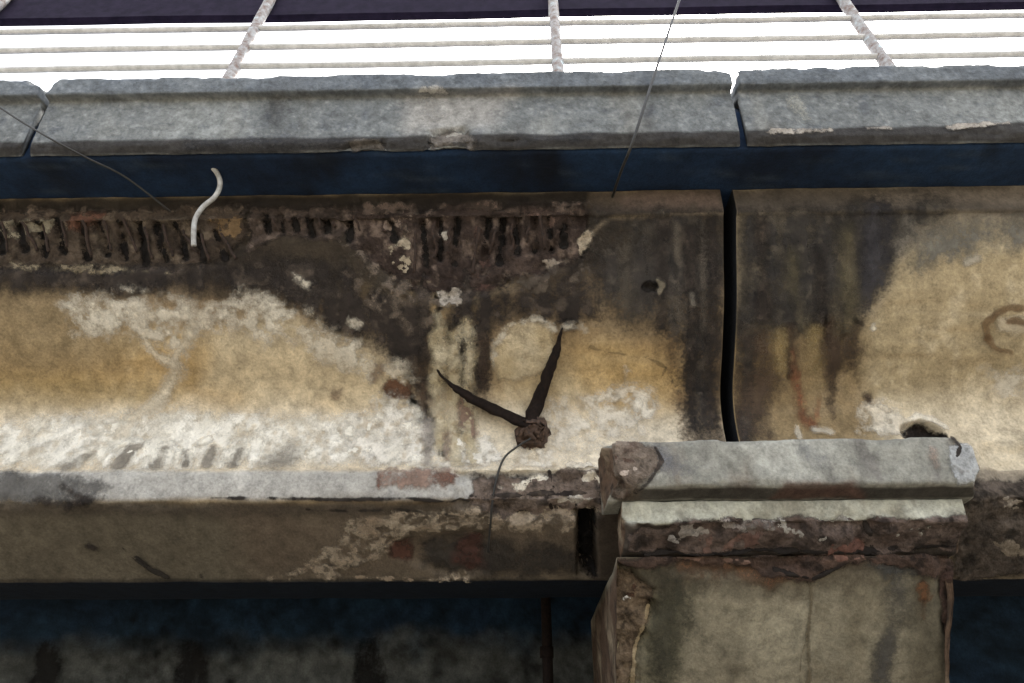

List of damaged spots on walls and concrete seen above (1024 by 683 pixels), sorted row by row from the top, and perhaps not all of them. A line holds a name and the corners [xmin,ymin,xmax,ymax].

spalling [0,200,593,363]
leakage [0,206,723,470]
leakage [734,195,1024,442]
spalling [289,441,664,582]
spalling [616,436,1024,683]